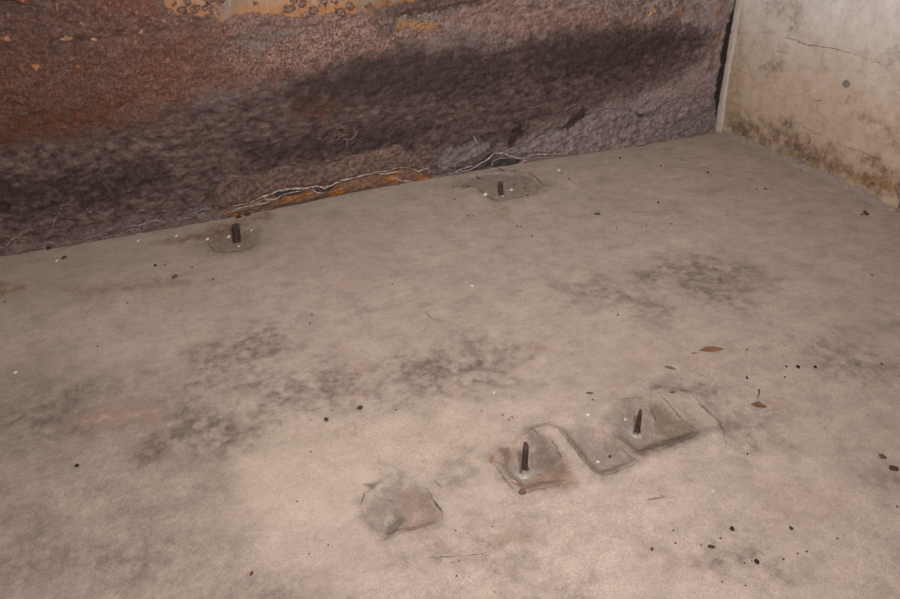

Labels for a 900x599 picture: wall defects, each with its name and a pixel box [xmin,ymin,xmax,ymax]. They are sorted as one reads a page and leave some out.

crack [0,136,565,249]
rust [214,144,431,232]
damp [0,22,708,253]
damp [729,121,841,170]